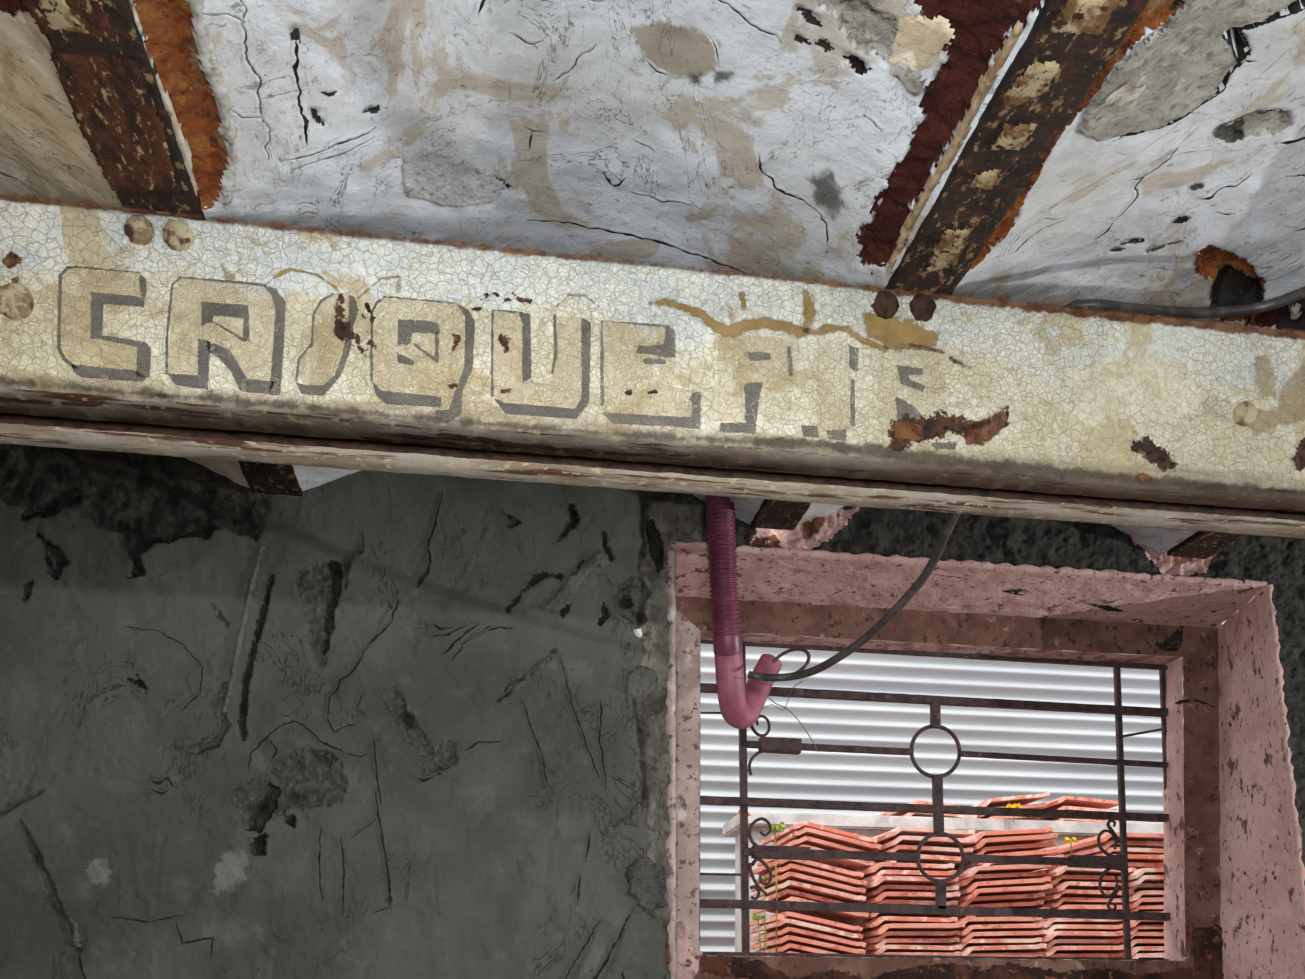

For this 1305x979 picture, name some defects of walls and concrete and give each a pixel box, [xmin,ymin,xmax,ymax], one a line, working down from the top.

flaking render [133,0,239,210]
spalling [288,28,337,146]
flaking render [399,146,512,207]
flaking render [968,0,1297,272]
crack [1095,0,1305,239]
rust [0,251,22,287]
rust [887,405,1010,452]
rust [1130,435,1179,483]
rust [1291,438,1305,471]
crack [246,490,445,916]
crack [557,653,609,790]
crack [107,912,216,958]